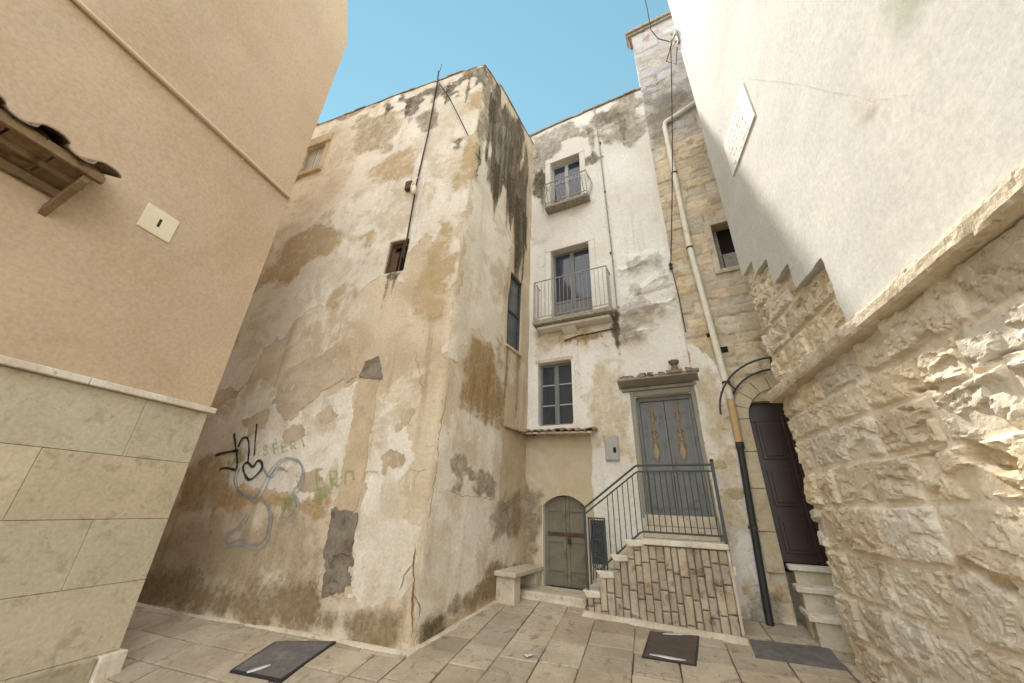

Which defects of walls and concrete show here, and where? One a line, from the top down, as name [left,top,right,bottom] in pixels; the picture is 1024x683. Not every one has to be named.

water stain [454,73,686,284]
peeling [174,66,515,513]
water stain [460,338,520,428]
water stain [611,307,665,347]
water stain [177,456,285,518]
water stain [137,497,402,647]
crack [400,355,493,637]
water stain [452,456,495,496]
water stain [420,486,541,639]